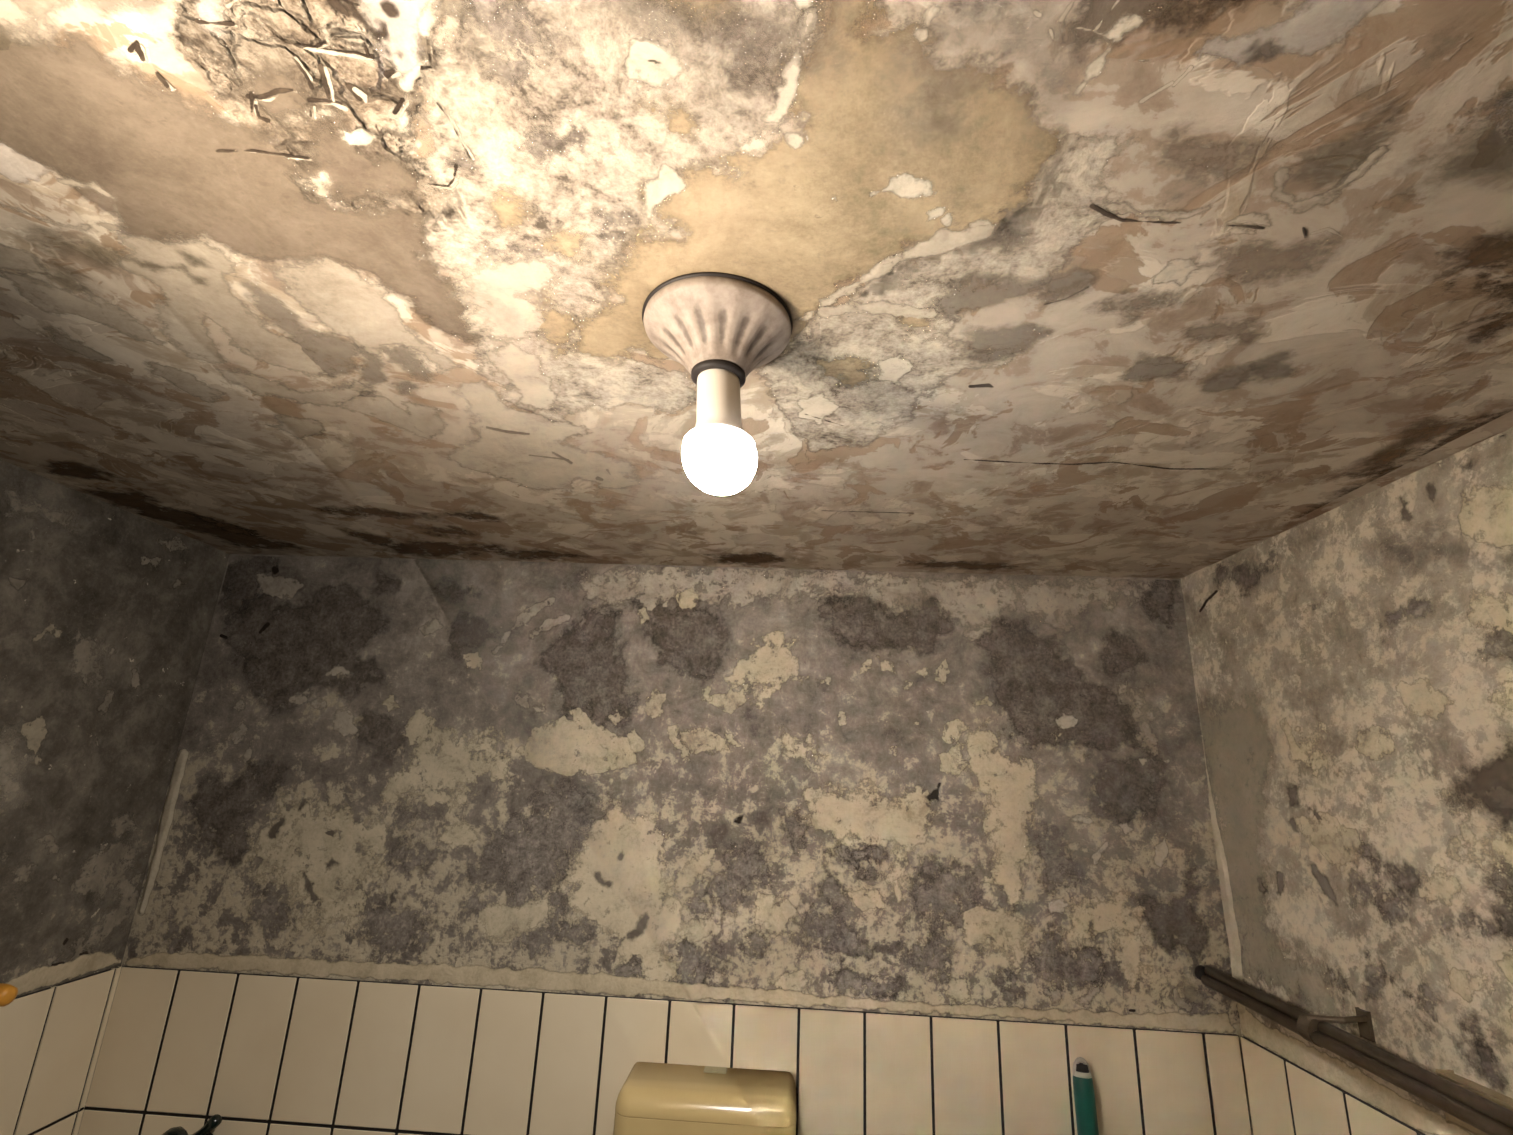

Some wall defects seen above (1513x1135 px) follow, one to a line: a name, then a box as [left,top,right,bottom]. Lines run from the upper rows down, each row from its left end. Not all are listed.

peeling [0,0,1129,490]
peeling [256,566,305,600]
water stain [220,556,405,757]
peeling [245,689,645,936]
water stain [540,597,728,728]
peeling [644,689,741,762]
peeling [701,630,831,714]
peeling [754,891,798,938]
water stain [789,839,982,1000]
water stain [977,618,1167,826]
water stain [1198,695,1441,1029]
water stain [1455,742,1513,843]